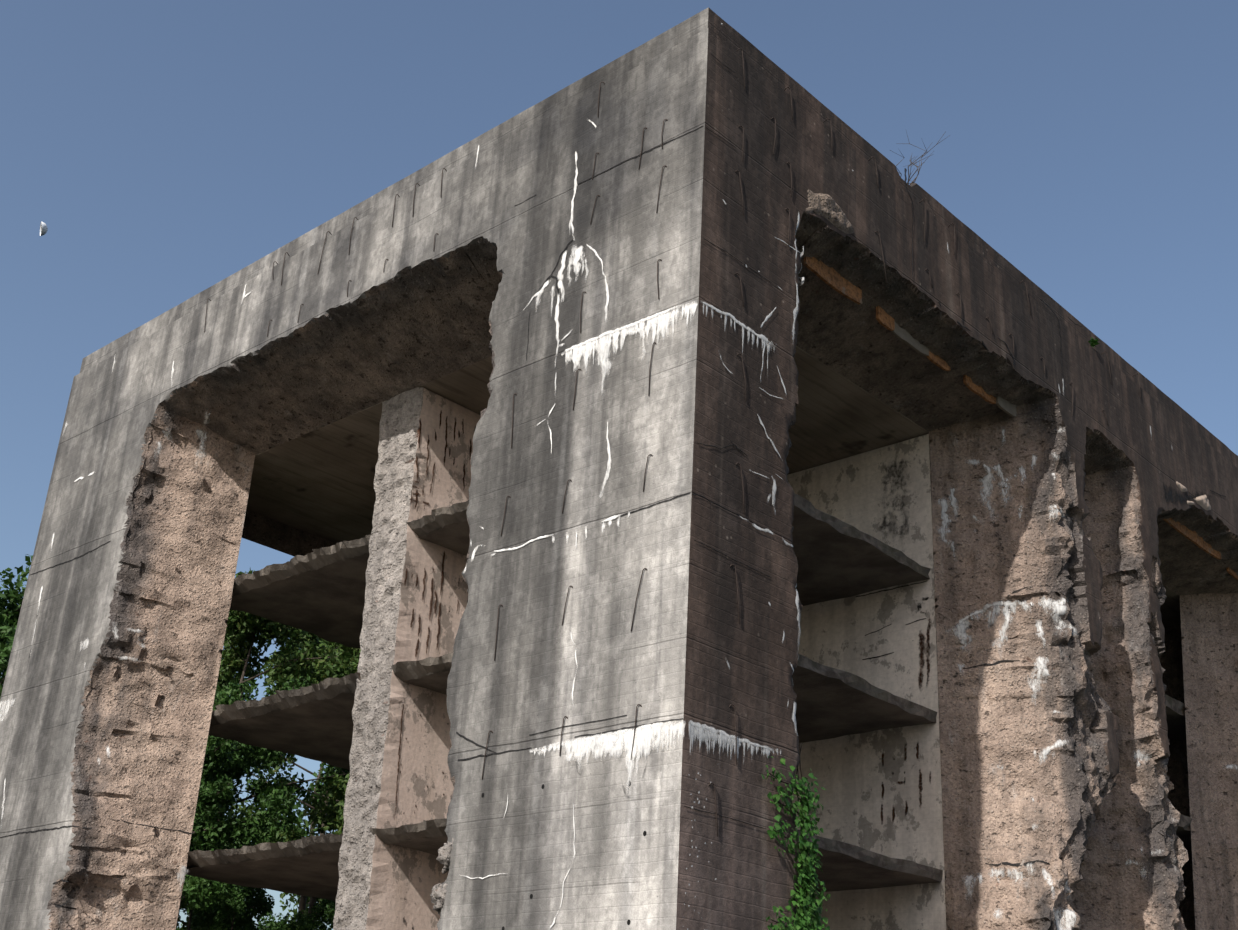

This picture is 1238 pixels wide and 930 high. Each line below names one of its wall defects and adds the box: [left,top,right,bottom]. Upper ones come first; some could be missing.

crack [526,126,736,360]
damp [529,279,770,383]
spalling [1163,481,1226,510]
damp [956,598,1075,649]
crack [963,660,1020,669]
damp [1032,657,1048,690]
damp [530,721,781,783]